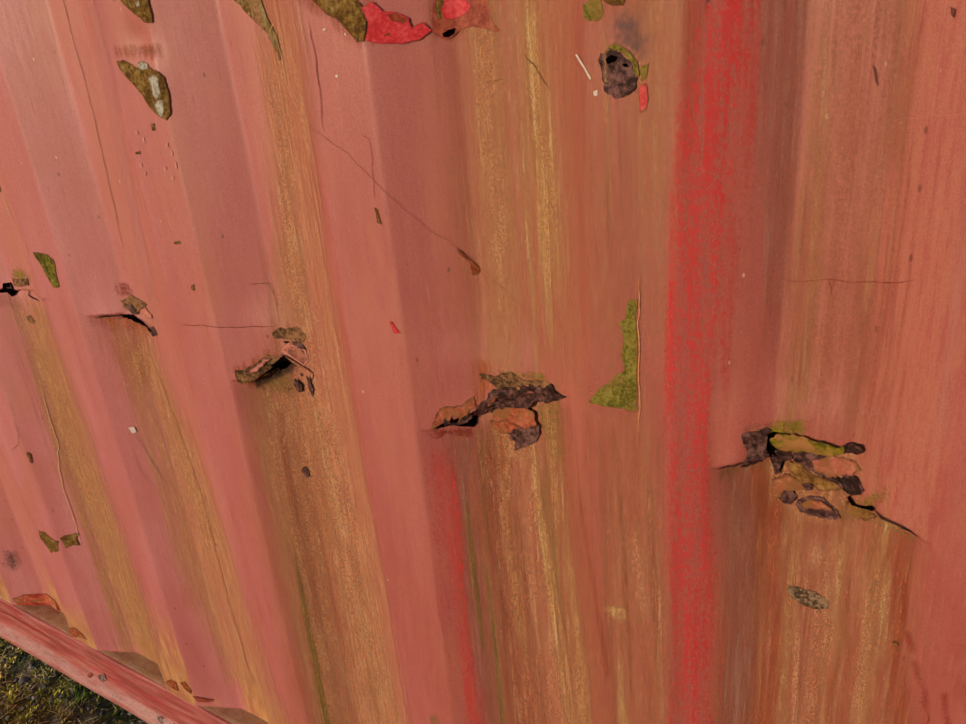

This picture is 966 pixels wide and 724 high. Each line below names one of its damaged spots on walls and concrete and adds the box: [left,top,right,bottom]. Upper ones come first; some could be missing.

peeling [121,0,153,23]
peeling [234,0,295,104]
peeling [312,0,367,42]
peeling [582,0,625,21]
peeling [117,48,170,175]
rust [255,0,408,724]
peeling [589,283,641,427]
rust [465,403,608,724]
rust [787,586,828,610]